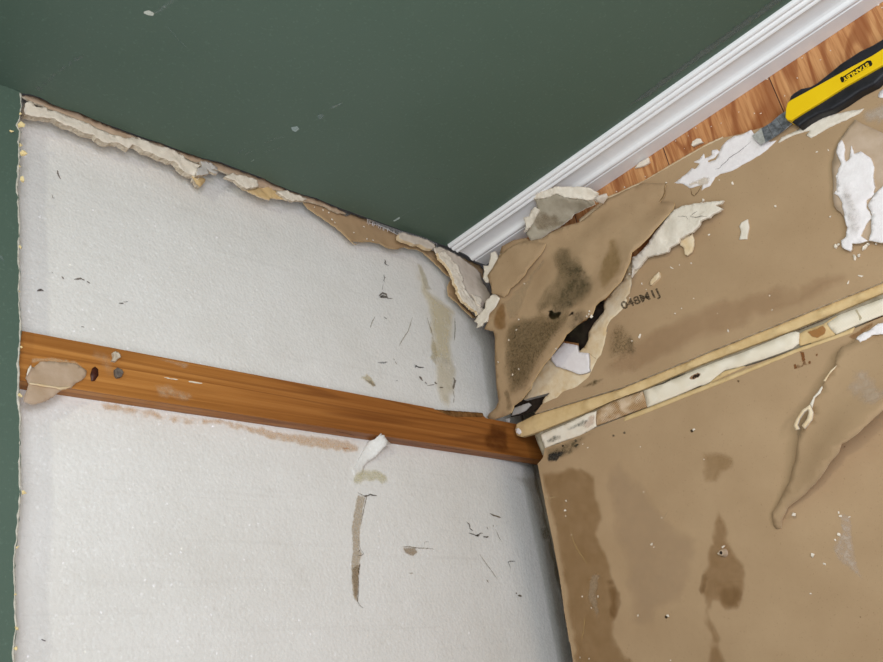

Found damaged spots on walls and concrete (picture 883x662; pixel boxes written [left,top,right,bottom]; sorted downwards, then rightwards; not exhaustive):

spalling [195,161,259,191]
spalling [275,190,307,203]
spalling [352,494,377,608]